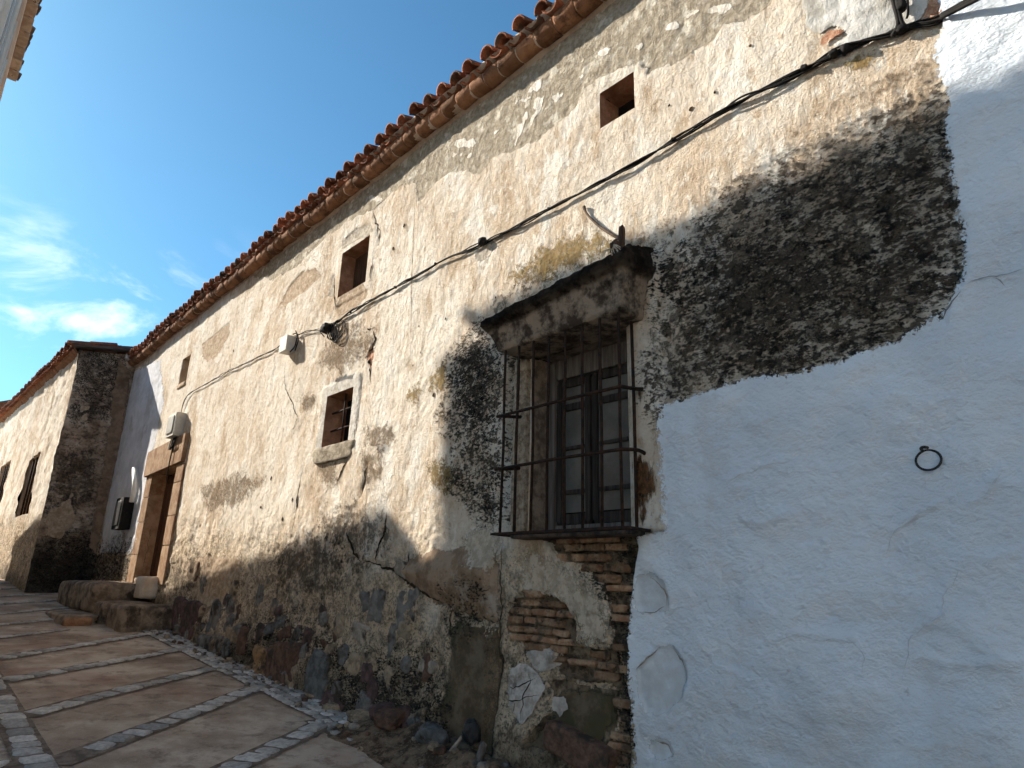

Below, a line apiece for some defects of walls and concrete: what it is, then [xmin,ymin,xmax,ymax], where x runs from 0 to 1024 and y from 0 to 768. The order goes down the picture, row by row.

water stain [635,57,970,428]
water stain [230,498,504,757]
crack [346,512,453,635]
water stain [433,248,558,530]
spalling [484,537,669,768]
corrosion [632,455,657,522]